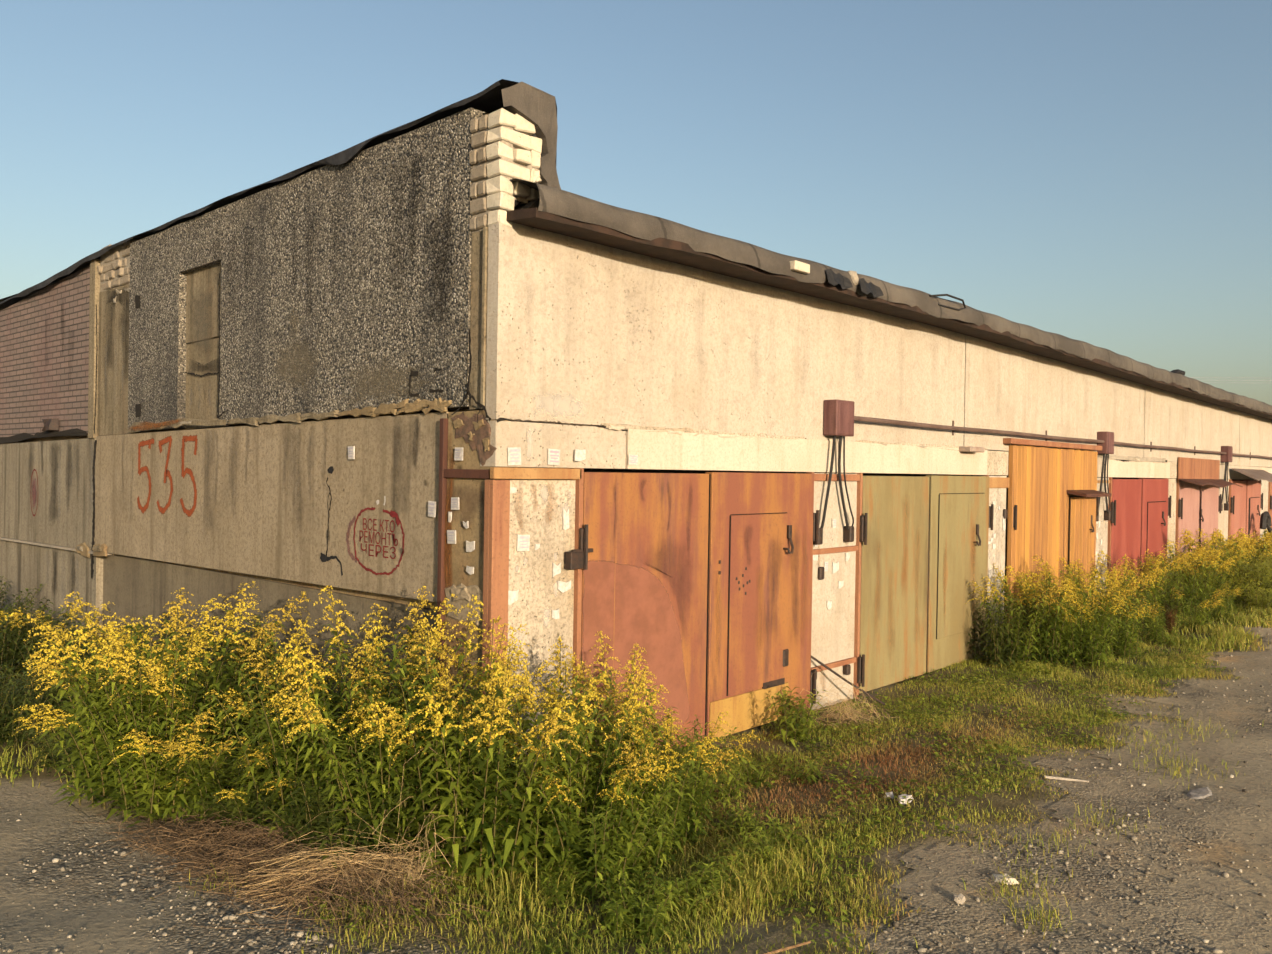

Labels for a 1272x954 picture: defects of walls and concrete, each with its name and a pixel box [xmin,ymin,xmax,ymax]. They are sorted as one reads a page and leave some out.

corrosion [581,560,690,745]